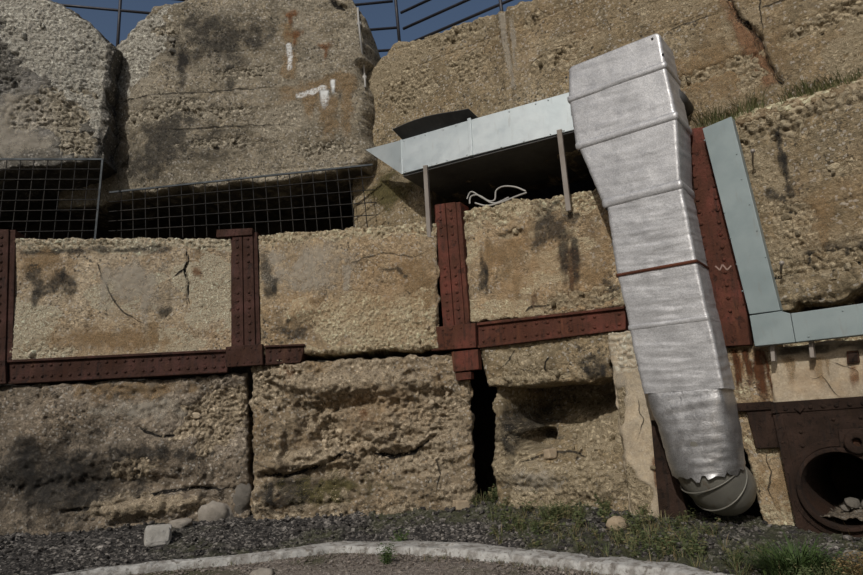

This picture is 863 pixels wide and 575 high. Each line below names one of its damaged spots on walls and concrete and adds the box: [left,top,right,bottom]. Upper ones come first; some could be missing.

crack [671,0,783,85]
corrosion [727,1,776,84]
damp [533,205,579,278]
damp [21,245,169,305]
crack [97,263,143,323]
crack [175,252,190,304]
corrosion [732,349,773,395]